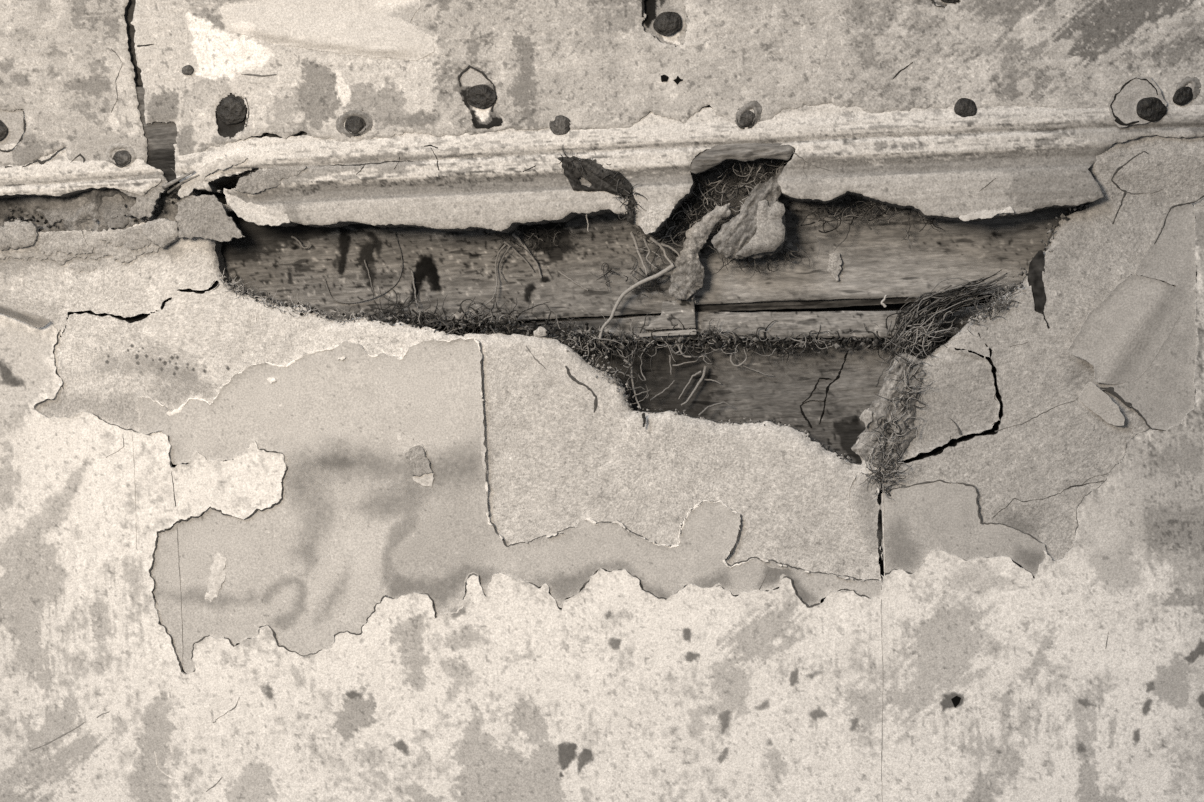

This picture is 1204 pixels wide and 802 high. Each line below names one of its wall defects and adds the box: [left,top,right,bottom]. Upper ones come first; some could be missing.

crack [1111,151,1162,224]
crack [57,281,219,338]
peeling [0,75,1204,674]
crack [848,333,1074,663]
crack [878,694,886,781]